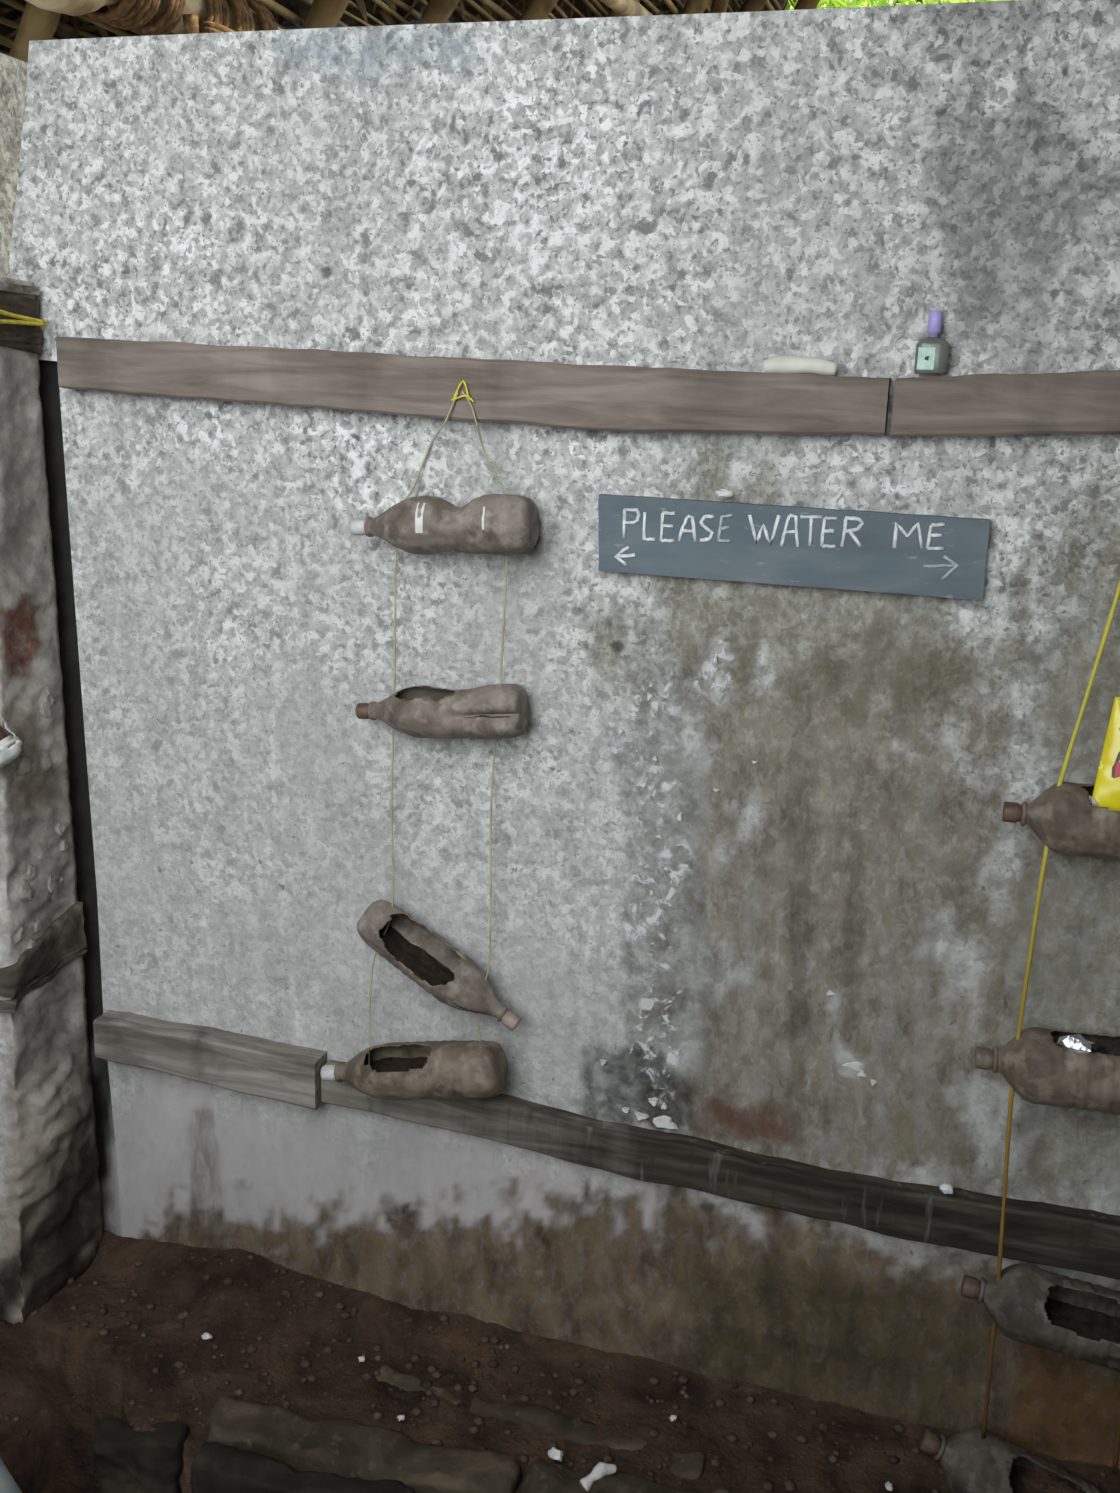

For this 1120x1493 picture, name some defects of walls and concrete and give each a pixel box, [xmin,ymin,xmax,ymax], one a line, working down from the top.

rust [0,599,40,677]
peeling [694,639,734,693]
peeling [599,683,693,1080]
leakage [586,577,1120,1195]
leakage [0,1068,101,1324]
leakage [141,1186,1120,1466]